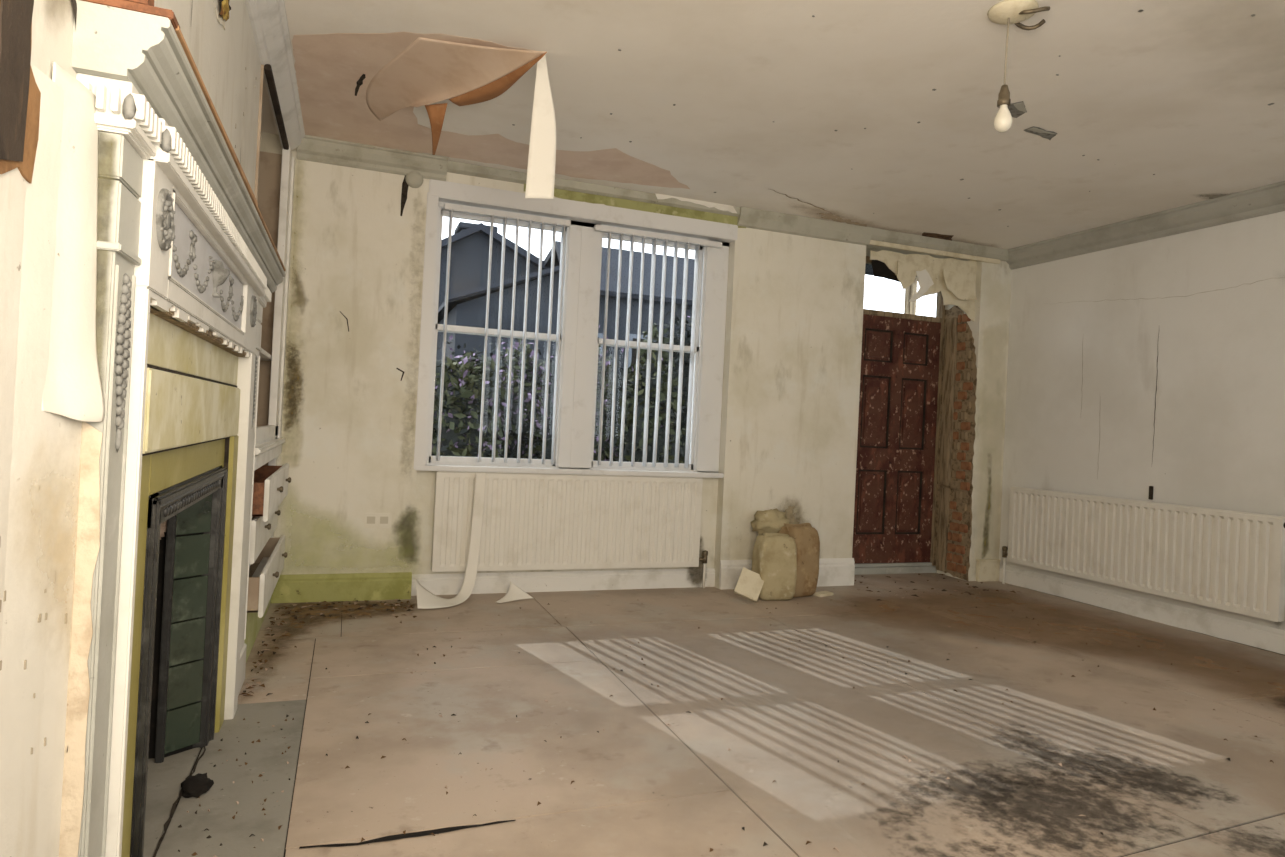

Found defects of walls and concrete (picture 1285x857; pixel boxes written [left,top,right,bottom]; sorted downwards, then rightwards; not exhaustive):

flaking render [215,0,231,30]